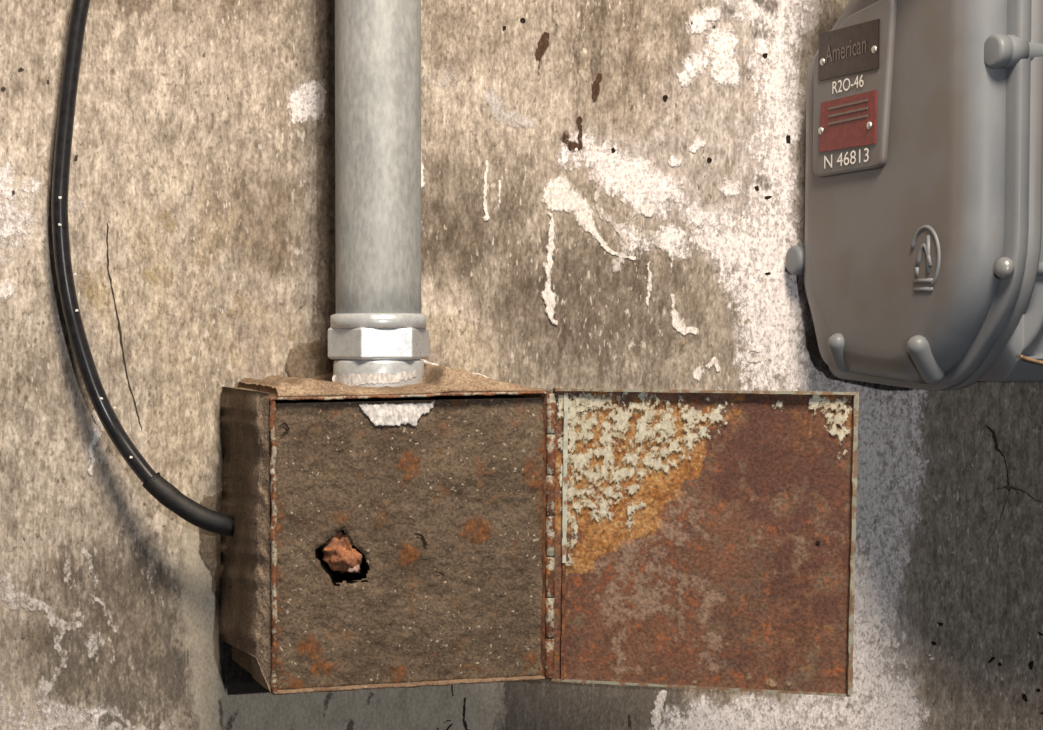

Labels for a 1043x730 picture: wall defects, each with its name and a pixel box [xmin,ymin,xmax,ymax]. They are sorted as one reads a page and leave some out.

rust [535,32,549,80]
rust [591,73,602,101]
rust [562,116,583,152]
water stain [502,0,932,730]
crack [985,425,1043,540]
spalling [315,530,370,586]